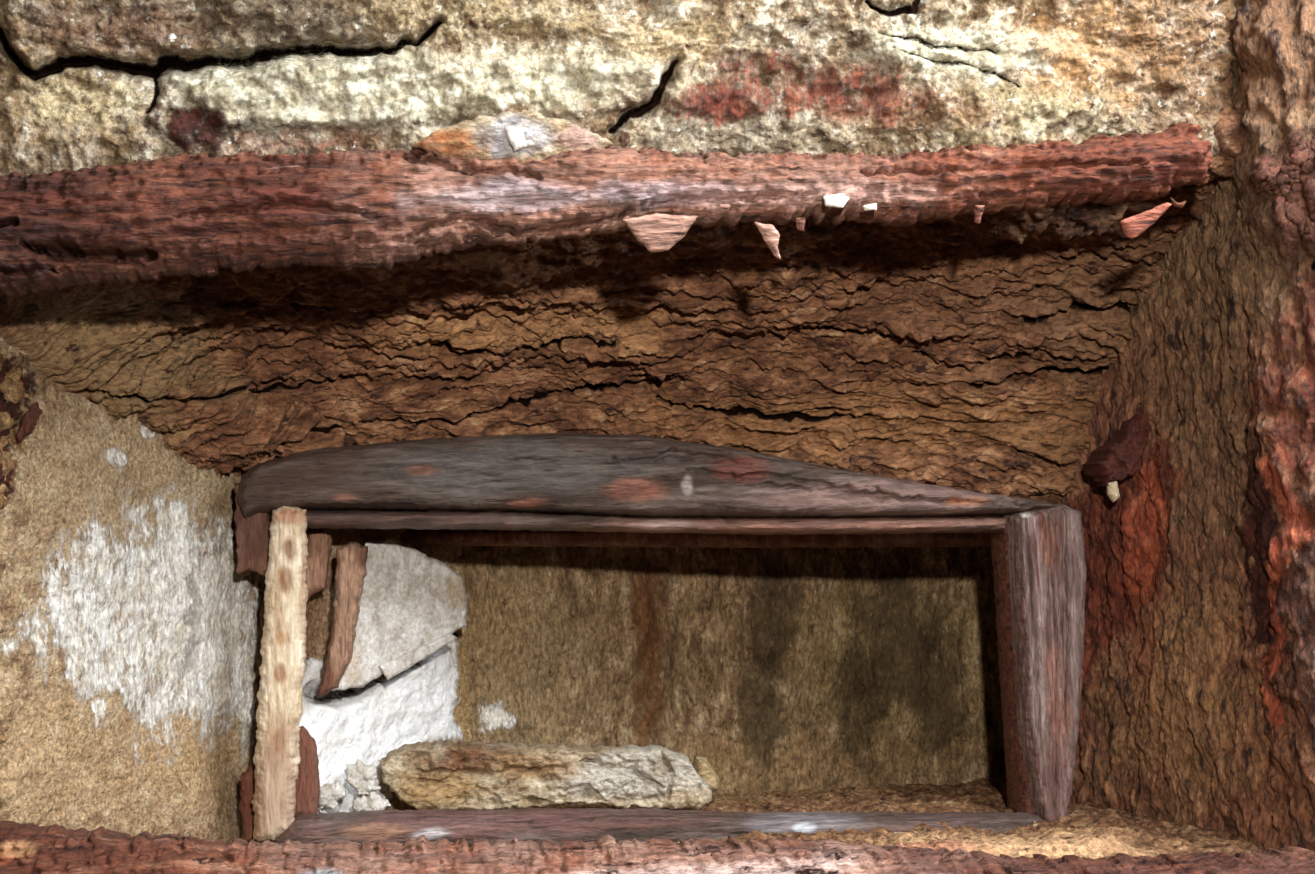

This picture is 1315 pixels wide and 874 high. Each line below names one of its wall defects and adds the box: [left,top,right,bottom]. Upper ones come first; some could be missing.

crack [0,21,442,113]
crack [609,59,679,133]
damp [105,448,127,467]
damp [140,424,156,439]
damp [1,484,266,763]
damp [740,559,801,764]